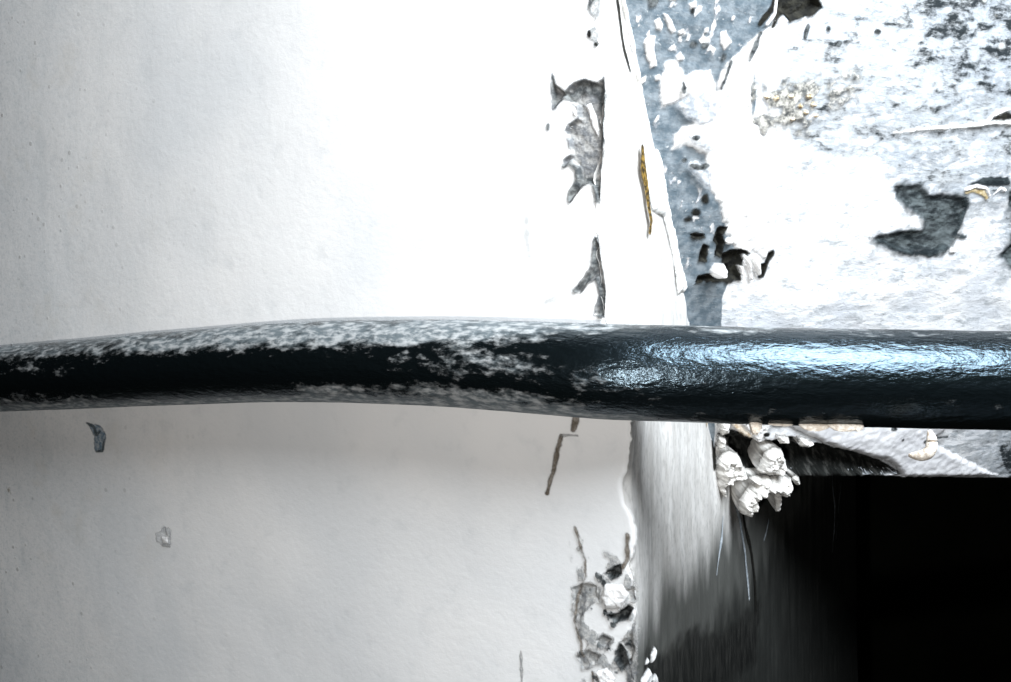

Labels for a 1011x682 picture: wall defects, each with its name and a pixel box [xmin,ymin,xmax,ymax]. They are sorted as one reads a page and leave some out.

spalling [587,0,600,47]
peeling [621,0,740,107]
spalling [749,31,763,62]
spalling [551,73,607,204]
spalling [748,73,860,135]
spalling [572,235,606,318]
peeling [645,149,714,294]
peeling [872,183,969,258]
peeling [1000,243,1011,265]
spalling [571,527,658,682]